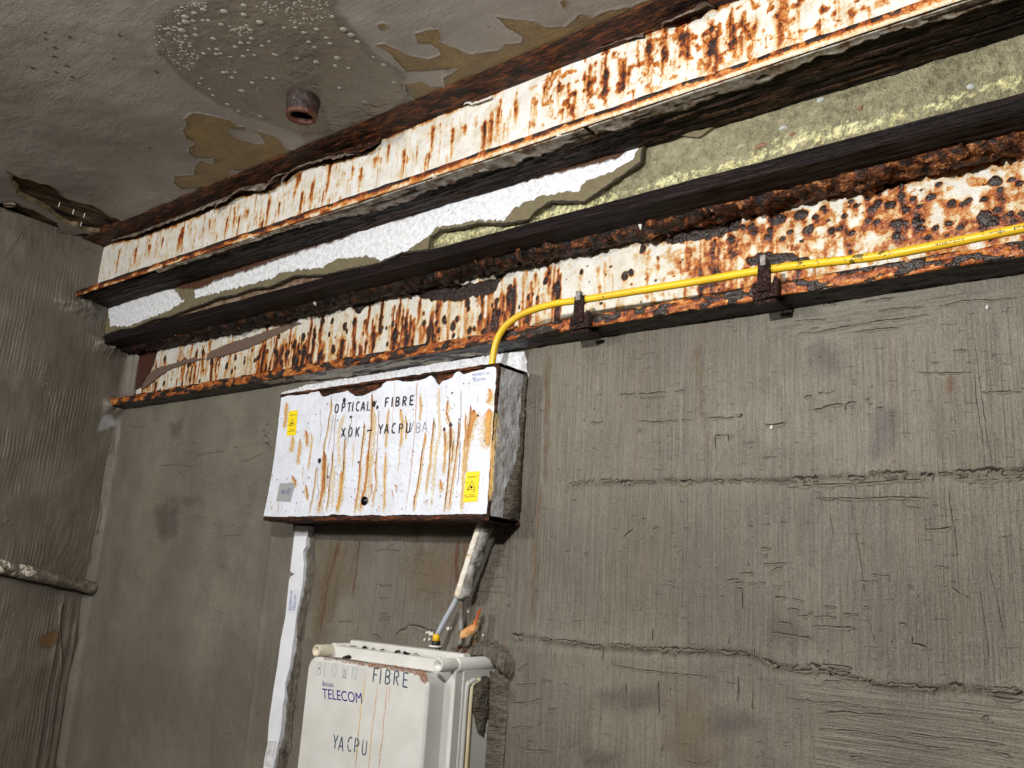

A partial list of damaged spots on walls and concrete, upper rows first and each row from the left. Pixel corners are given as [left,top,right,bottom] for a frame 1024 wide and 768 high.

leakage [154,0,408,136]
peeling [374,0,653,101]
flaking render [4,171,122,235]
peeling [172,111,298,189]
peeling [108,148,638,327]
rust [79,0,1024,308]
crack [601,647,756,714]
crack [727,517,890,658]
crack [899,622,927,651]